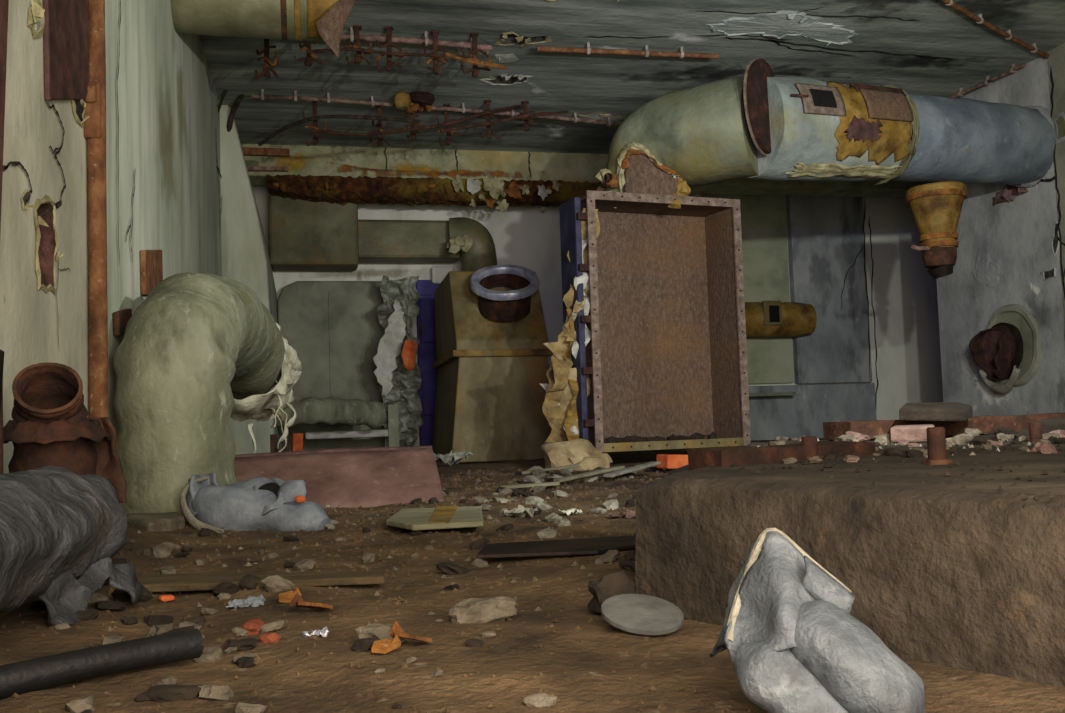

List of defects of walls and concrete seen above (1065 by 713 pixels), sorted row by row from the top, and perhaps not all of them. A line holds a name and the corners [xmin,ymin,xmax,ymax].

spalling [454,31,552,86]
crack [3,102,70,310]
spalling [21,188,64,295]
rust [267,154,603,207]
peeling [452,174,562,213]
crack [1025,67,1065,298]